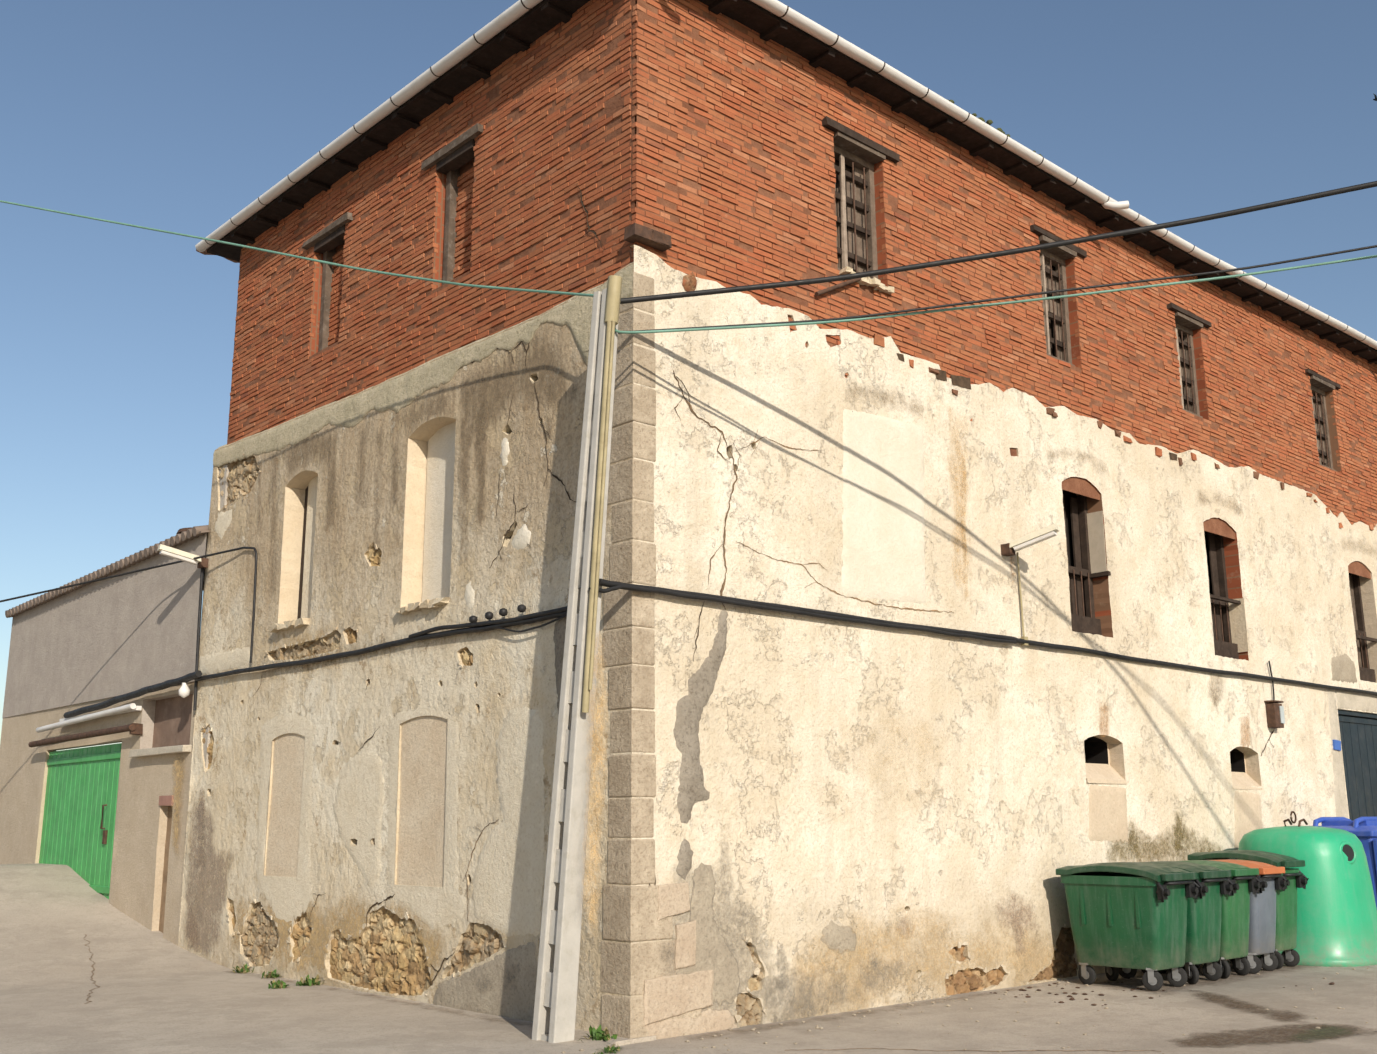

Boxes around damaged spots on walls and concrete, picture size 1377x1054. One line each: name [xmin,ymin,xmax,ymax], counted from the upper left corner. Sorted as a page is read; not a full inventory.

spalling [682,272,697,292]
spalling [936,369,971,389]
spalling [218,453,261,509]
leakage [460,338,574,521]
crack [459,341,575,566]
crack [673,370,954,662]
spalling [265,627,358,662]
crack [463,819,499,919]
spalling [226,899,312,966]
spalling [323,907,504,996]
spalling [734,936,766,1027]
spalling [945,941,1005,995]